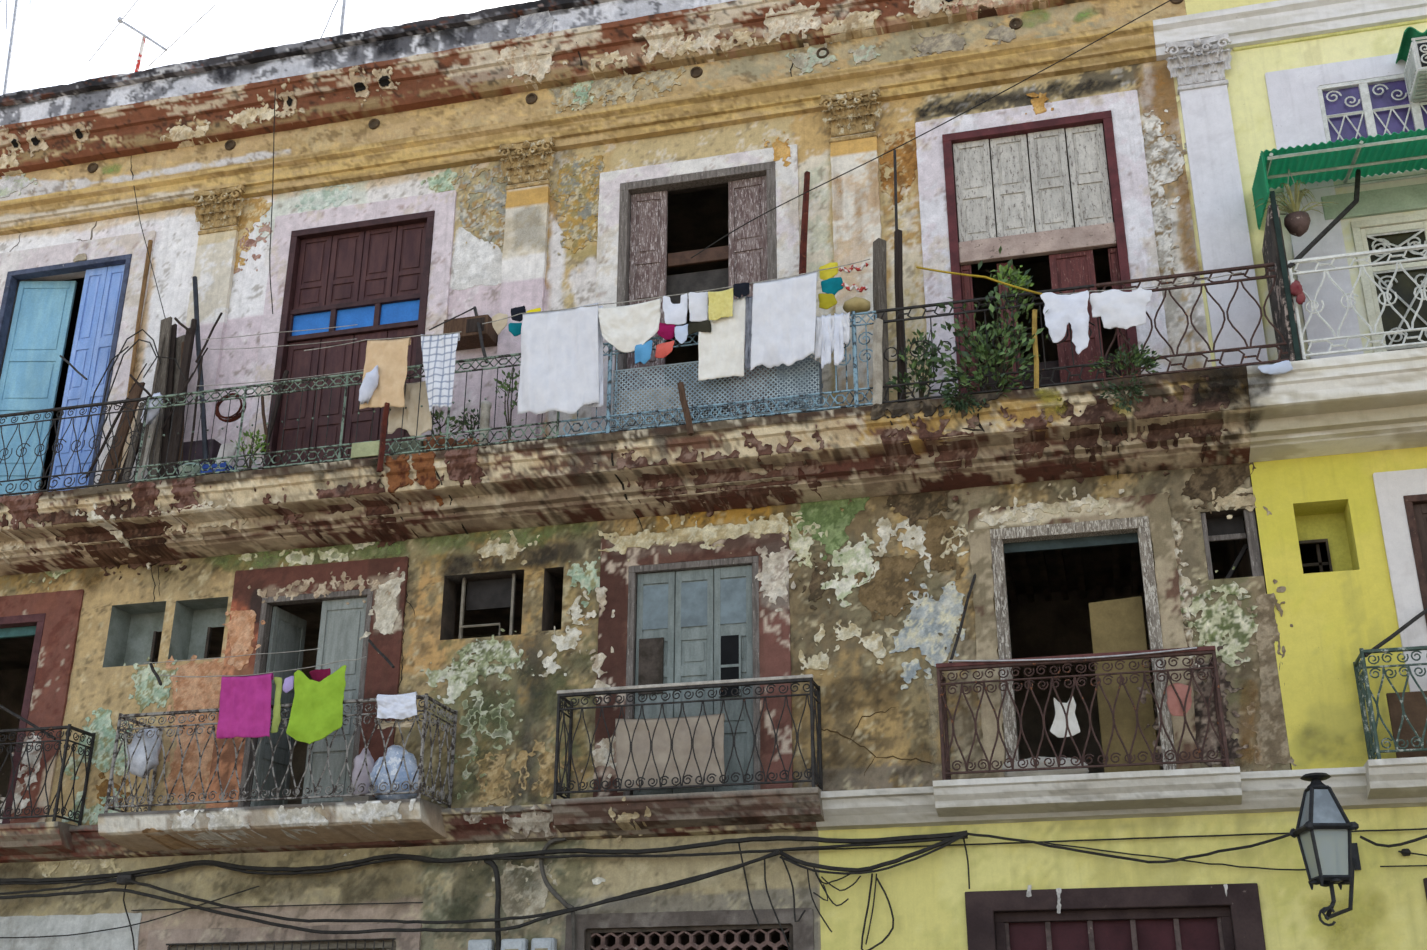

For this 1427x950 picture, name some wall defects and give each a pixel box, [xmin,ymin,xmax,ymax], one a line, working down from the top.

peeling [0,125,54,198]
hole [69,113,96,153]
peeling [160,78,305,148]
peeling [234,183,355,281]
hole [342,61,400,107]
peeling [550,149,605,267]
peeling [496,0,1050,114]
peeling [1142,109,1188,288]
peeling [62,468,419,856]
flaking render [348,375,1297,934]